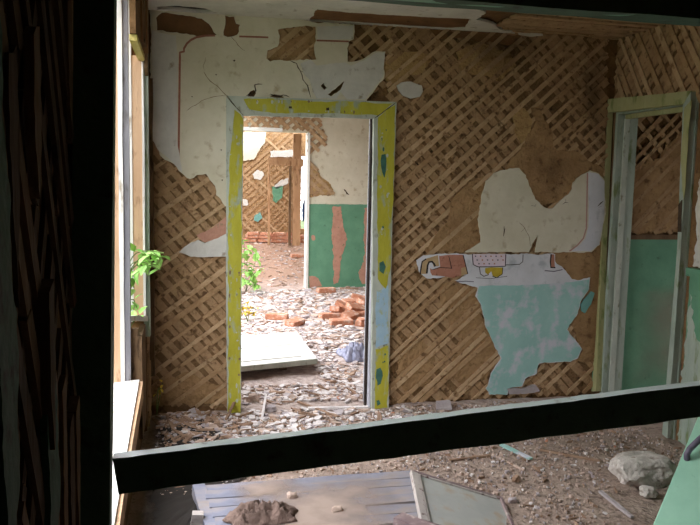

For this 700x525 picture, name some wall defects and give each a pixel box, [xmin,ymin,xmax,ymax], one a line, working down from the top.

flaking render [140,0,700,410]
peeling [677,417,698,446]